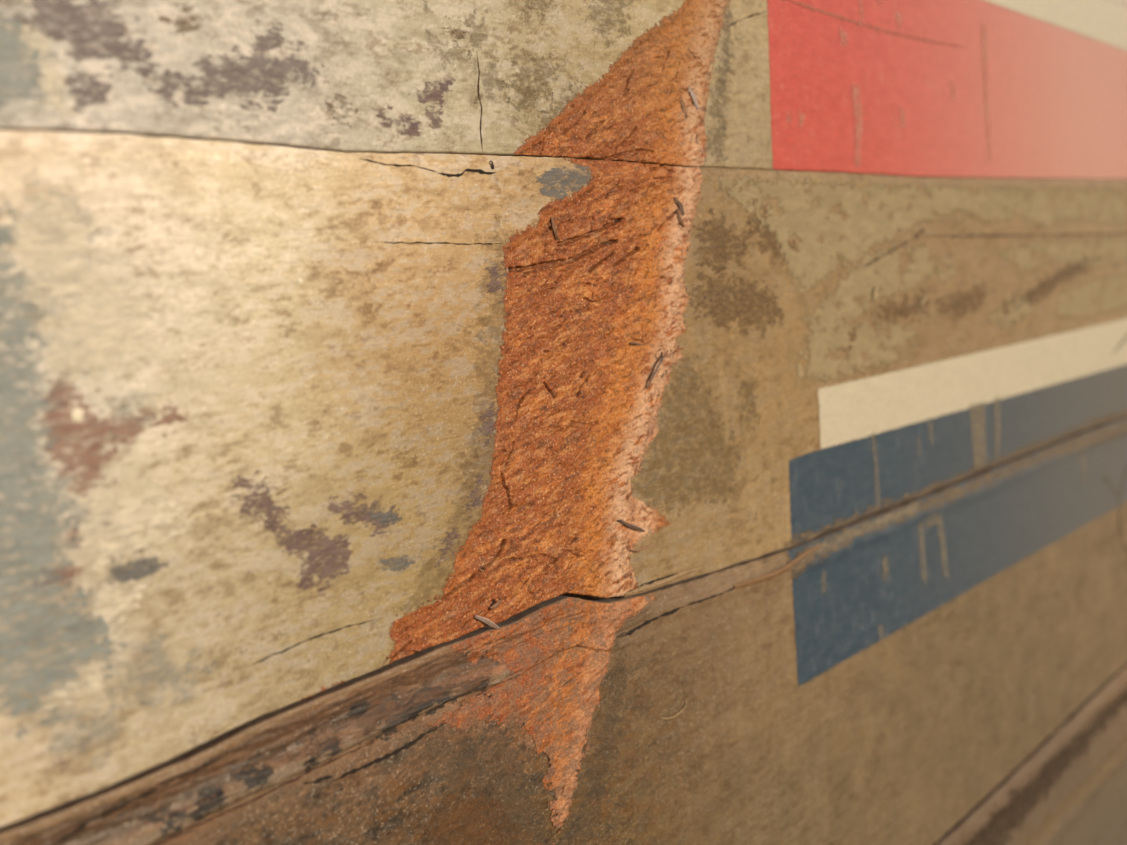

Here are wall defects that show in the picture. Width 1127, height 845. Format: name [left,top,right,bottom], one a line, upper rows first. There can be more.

crack [791,0,966,48]
crack [359,56,497,177]
crack [629,573,678,592]
crack [614,587,734,638]
crack [248,620,372,667]
crack [53,759,217,845]
crack [158,720,450,845]